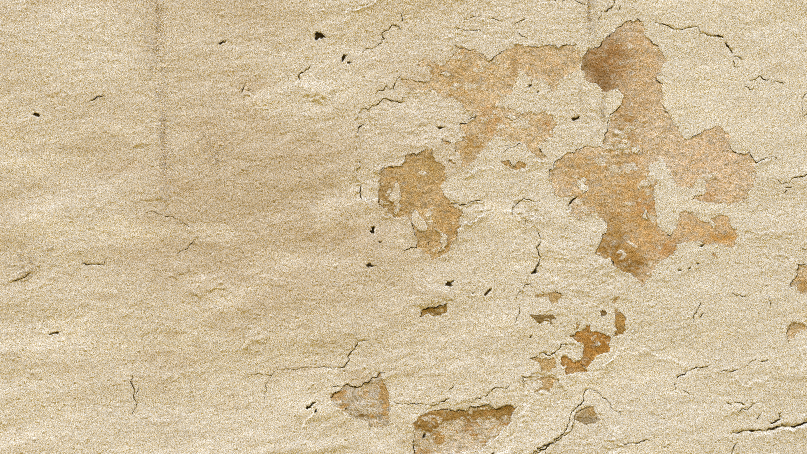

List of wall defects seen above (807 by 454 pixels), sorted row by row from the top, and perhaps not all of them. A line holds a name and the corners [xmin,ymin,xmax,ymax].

crack [654,22,743,67]
crack [358,75,403,130]
peeling [378,18,764,287]
peeling [790,264,807,294]
peeling [530,297,626,392]
peeling [787,322,807,341]
peeling [330,372,391,428]
peeling [413,404,516,454]
crack [471,344,568,403]
crack [533,389,621,454]
crack [727,402,807,452]